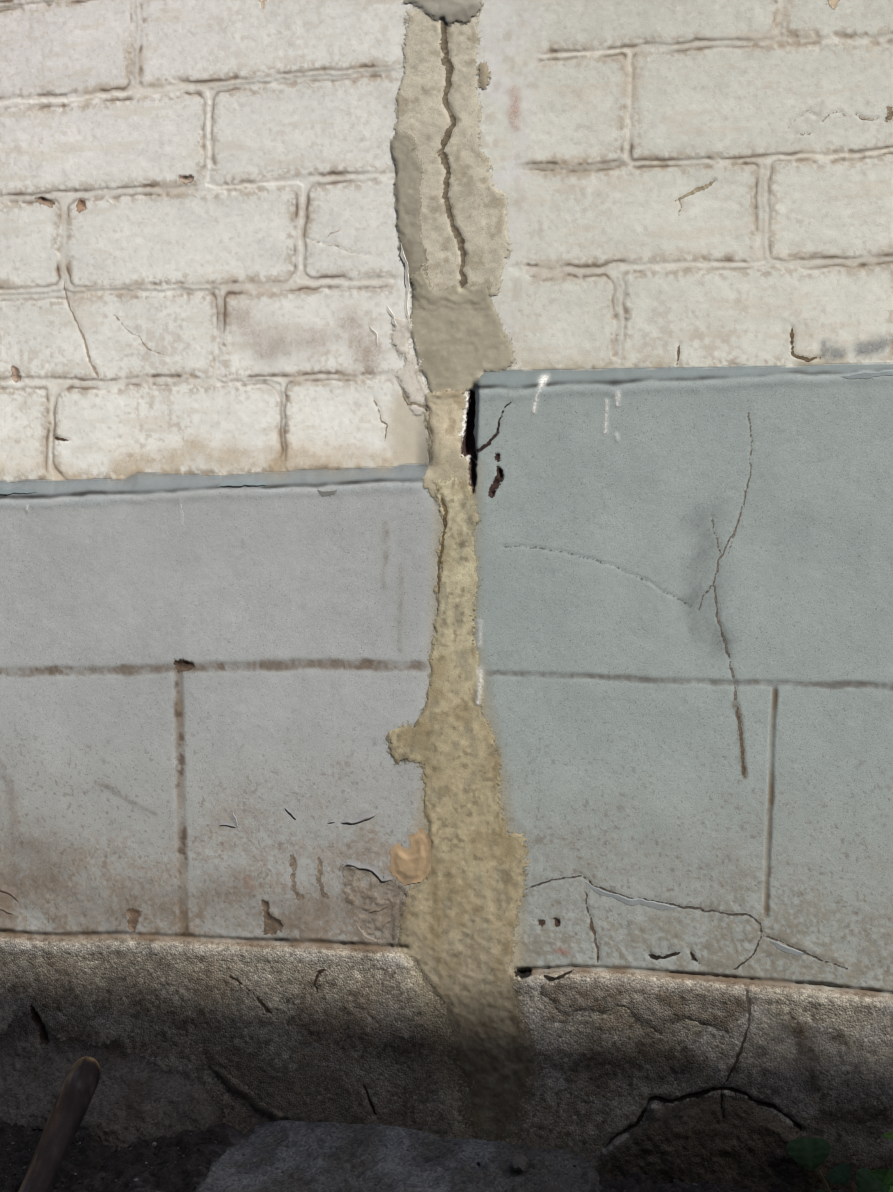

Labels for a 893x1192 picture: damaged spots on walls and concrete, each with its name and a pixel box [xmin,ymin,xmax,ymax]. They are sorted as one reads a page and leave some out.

crack [437,21,468,288]
crack [64,281,99,378]
peeling [369,244,432,416]
crack [477,402,511,452]
spalling [488,453,504,498]
crack [674,413,753,777]
crack [230,976,272,1014]
crack [526,875,848,1147]